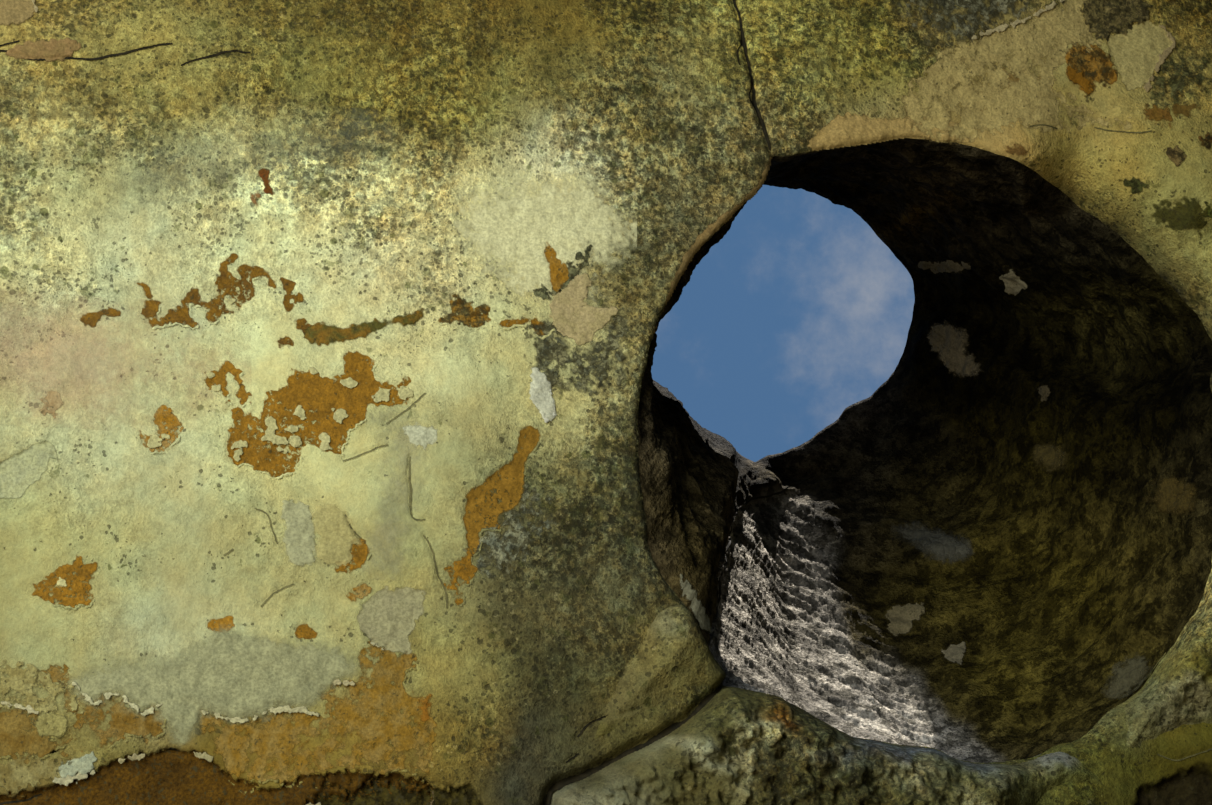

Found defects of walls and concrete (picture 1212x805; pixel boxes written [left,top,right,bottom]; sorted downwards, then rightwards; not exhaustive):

crack [0,40,250,66]
crack [732,0,771,151]
rust [1063,42,1118,97]
rust [1191,132,1212,149]
peeling [0,616,483,805]
crack [566,715,608,763]